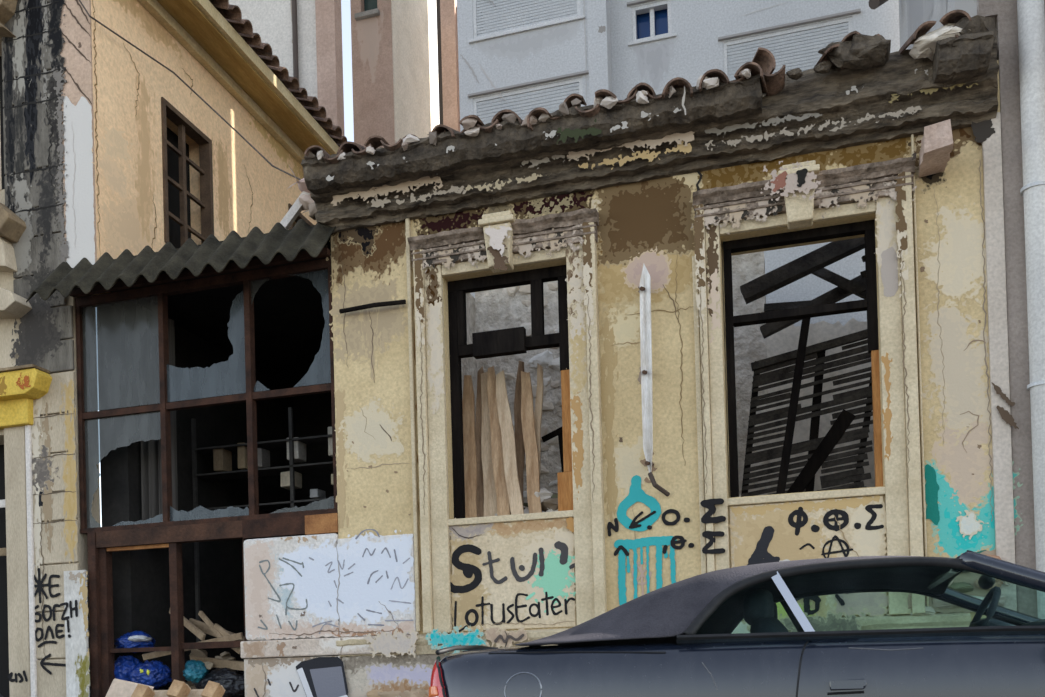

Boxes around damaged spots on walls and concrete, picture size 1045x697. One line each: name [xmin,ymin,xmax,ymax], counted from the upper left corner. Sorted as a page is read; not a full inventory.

peeling [523,193,601,219]
peeling [331,106,922,208]
spalling [405,223,672,414]
peeling [691,161,1019,511]
peeling [334,396,405,473]
peeling [69,571,89,658]